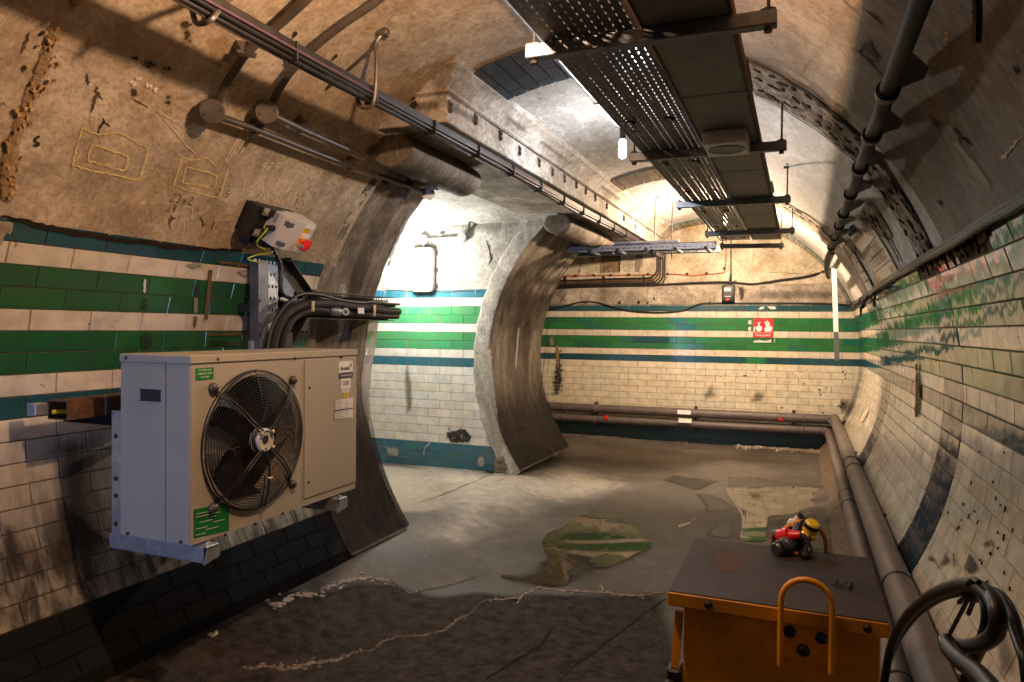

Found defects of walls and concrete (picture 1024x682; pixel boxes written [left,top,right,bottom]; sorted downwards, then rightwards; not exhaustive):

spalling [0,21,62,202]
spalling [748,62,862,162]
spalling [860,163,987,276]
damp [551,350,564,395]
crack [485,625,555,681]